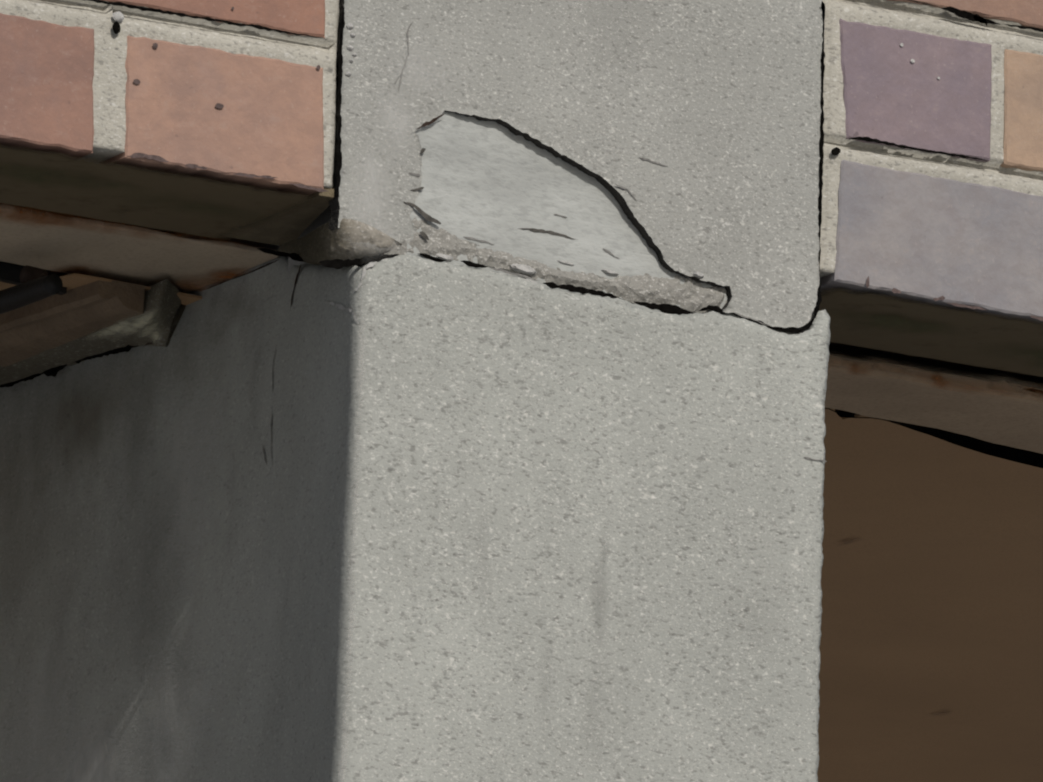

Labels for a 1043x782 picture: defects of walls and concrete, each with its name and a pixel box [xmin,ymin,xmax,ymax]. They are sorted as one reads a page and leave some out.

crack [908,0,1043,32]
crack [205,8,825,333]
spalling [355,111,740,318]
crack [849,137,988,161]